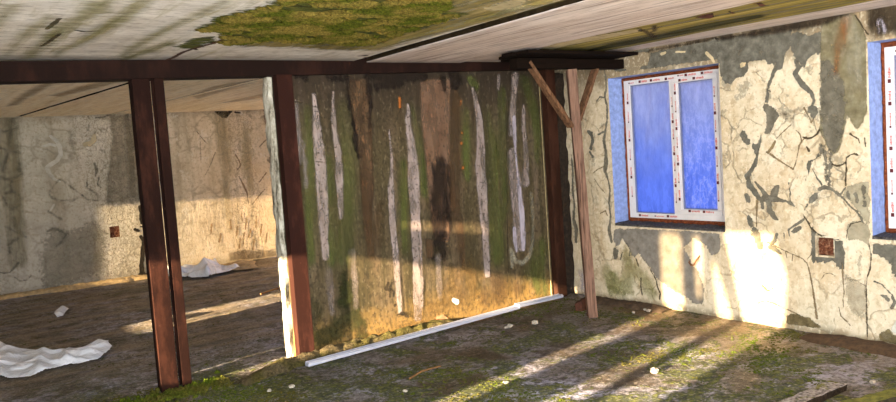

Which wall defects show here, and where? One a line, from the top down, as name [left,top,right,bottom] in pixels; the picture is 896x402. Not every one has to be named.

crack [133,188,147,275]
crack [197,132,267,204]
leakage [312,75,359,264]
leakage [363,72,490,321]
leakage [509,72,530,252]
spalling [630,13,896,277]
crack [766,105,820,170]
crack [832,133,866,186]
spalling [873,281,896,309]
spalling [879,329,896,344]